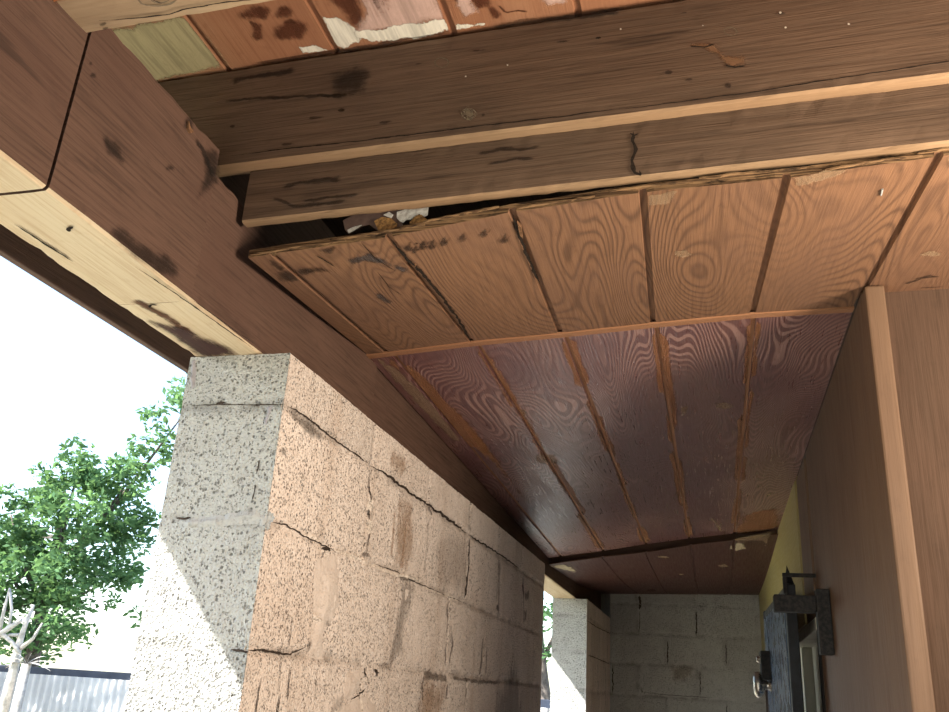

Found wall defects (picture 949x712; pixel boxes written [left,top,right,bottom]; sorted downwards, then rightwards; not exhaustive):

water stain [234,0,616,83]
water stain [230,71,367,111]
crack [233,61,949,156]
crack [630,132,642,176]
crack [194,401,524,625]
crack [231,647,305,655]